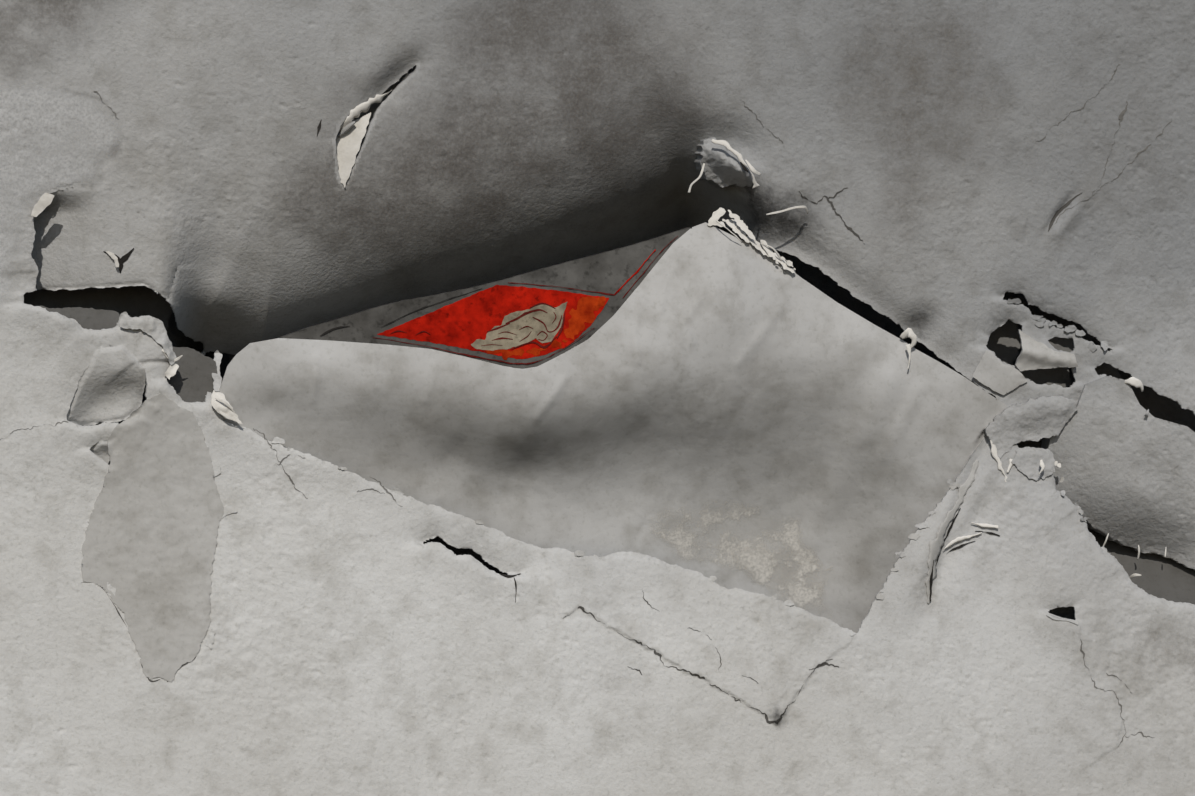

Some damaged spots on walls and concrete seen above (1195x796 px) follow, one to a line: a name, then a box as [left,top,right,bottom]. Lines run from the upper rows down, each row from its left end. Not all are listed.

spalling [972,319,1078,395]
spalling [1095,363,1122,379]
peeling [24,186,243,682]
crack [423,536,521,602]
spalling [1088,528,1195,604]
crack [565,606,839,724]